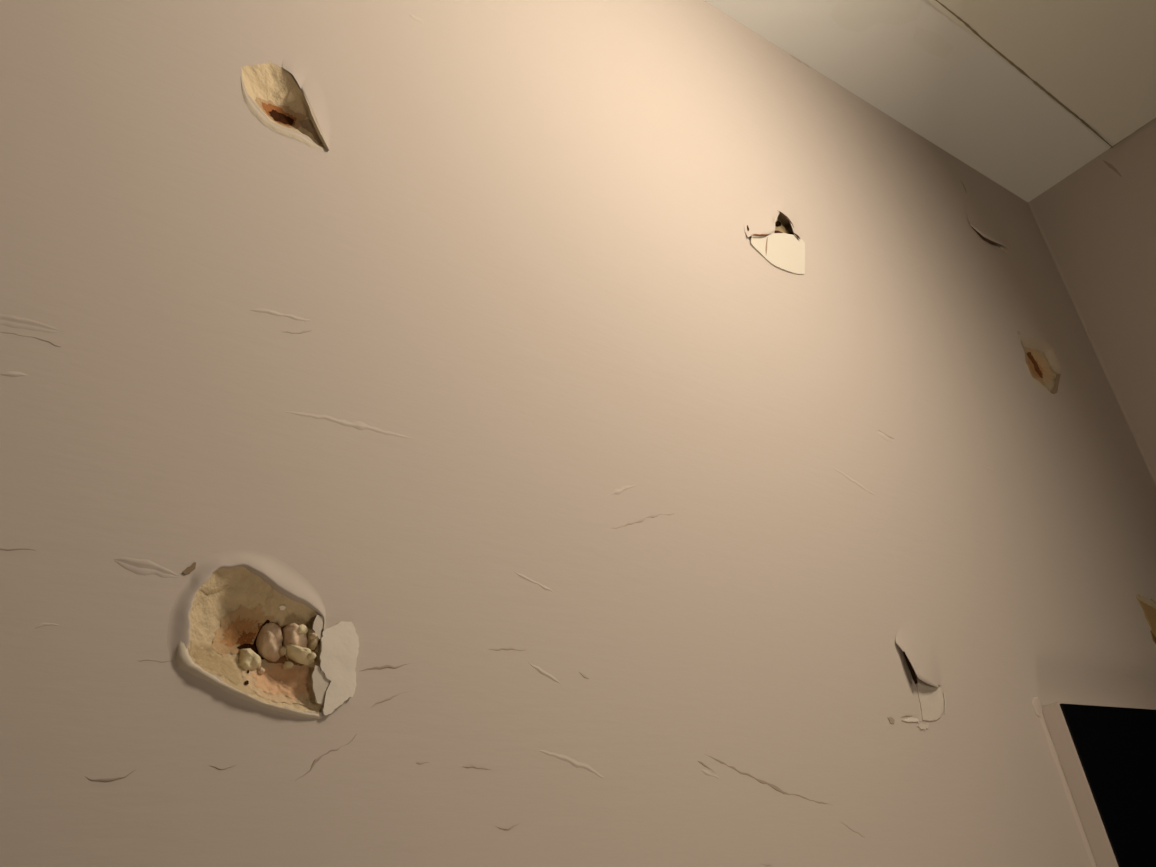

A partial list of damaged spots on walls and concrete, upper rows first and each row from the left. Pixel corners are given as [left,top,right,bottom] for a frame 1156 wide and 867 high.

flaking render [241,55,331,152]
hole [743,191,805,275]
flaking render [1020,337,1062,394]
flaking render [167,549,359,720]
crack [698,754,865,838]